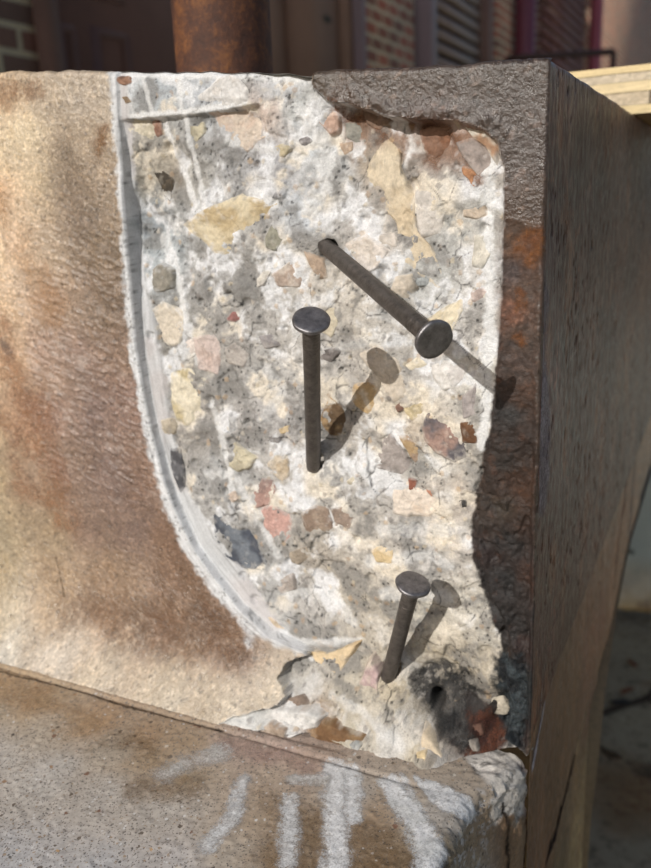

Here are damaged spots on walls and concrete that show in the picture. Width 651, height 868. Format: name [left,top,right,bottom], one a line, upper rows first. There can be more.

corrosion [333,101,364,121]
spalling [116,72,533,823]
corrosion [447,219,543,757]
leakage [409,653,528,753]
crack [502,803,510,868]
crack [545,755,576,868]